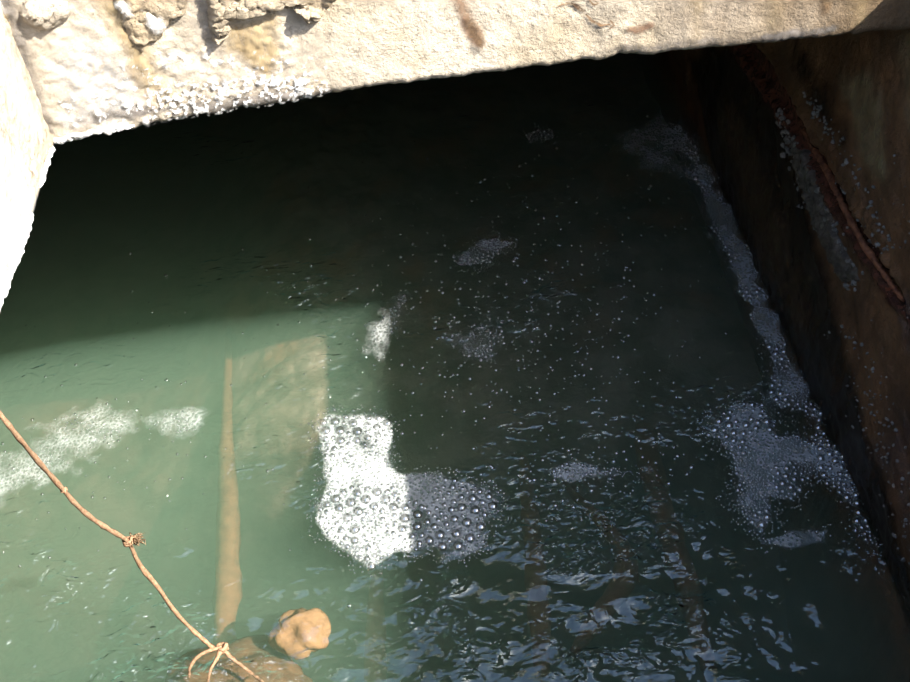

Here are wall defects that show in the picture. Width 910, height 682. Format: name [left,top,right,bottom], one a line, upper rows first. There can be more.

spalling [113,0,188,60]
spalling [206,0,336,45]
rust [456,0,484,47]
crack [559,0,615,29]
water stain [0,0,326,311]
rust [732,43,910,327]